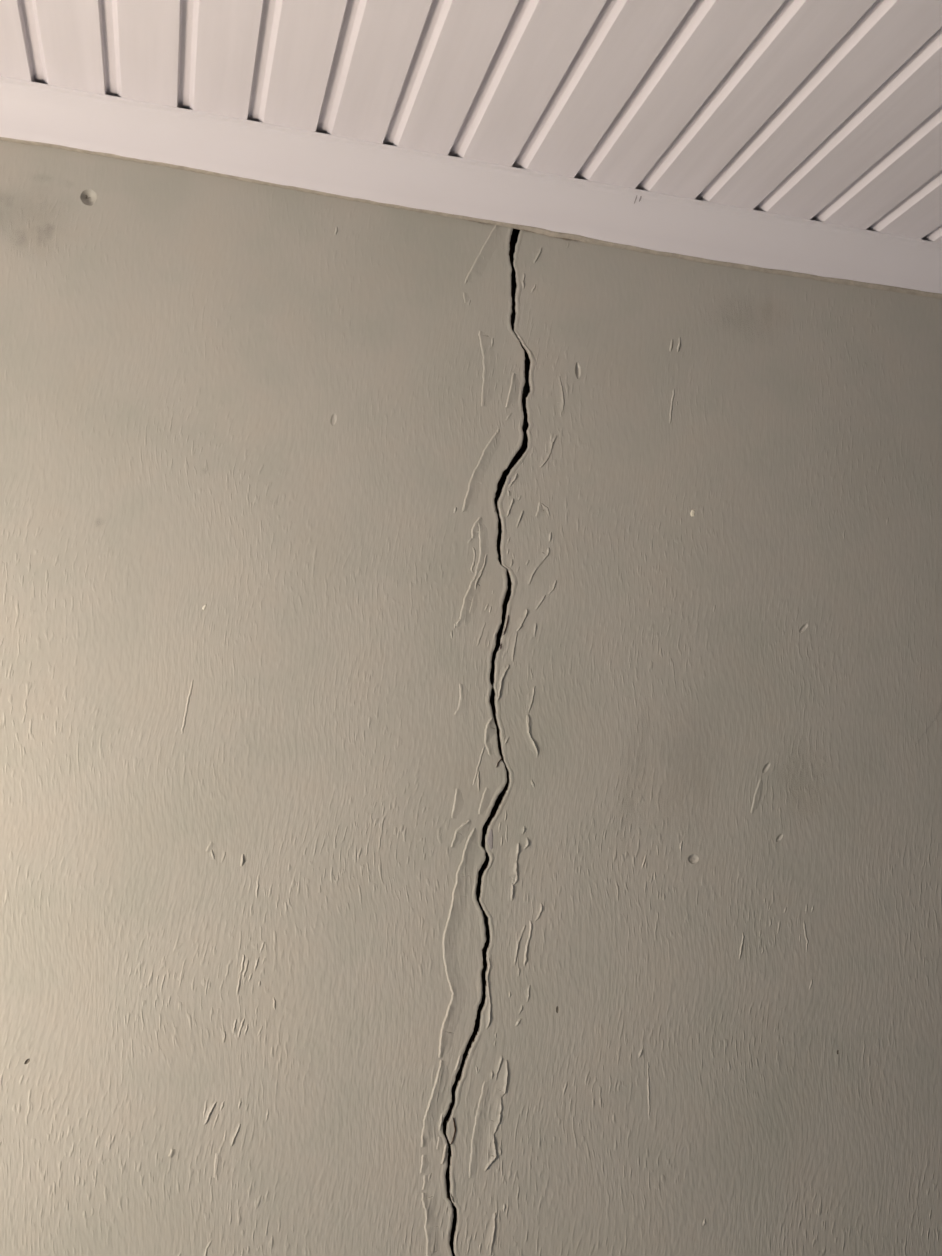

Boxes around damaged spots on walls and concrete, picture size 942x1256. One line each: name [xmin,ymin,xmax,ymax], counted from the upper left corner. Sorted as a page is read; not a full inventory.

crack [438,228,536,1256]